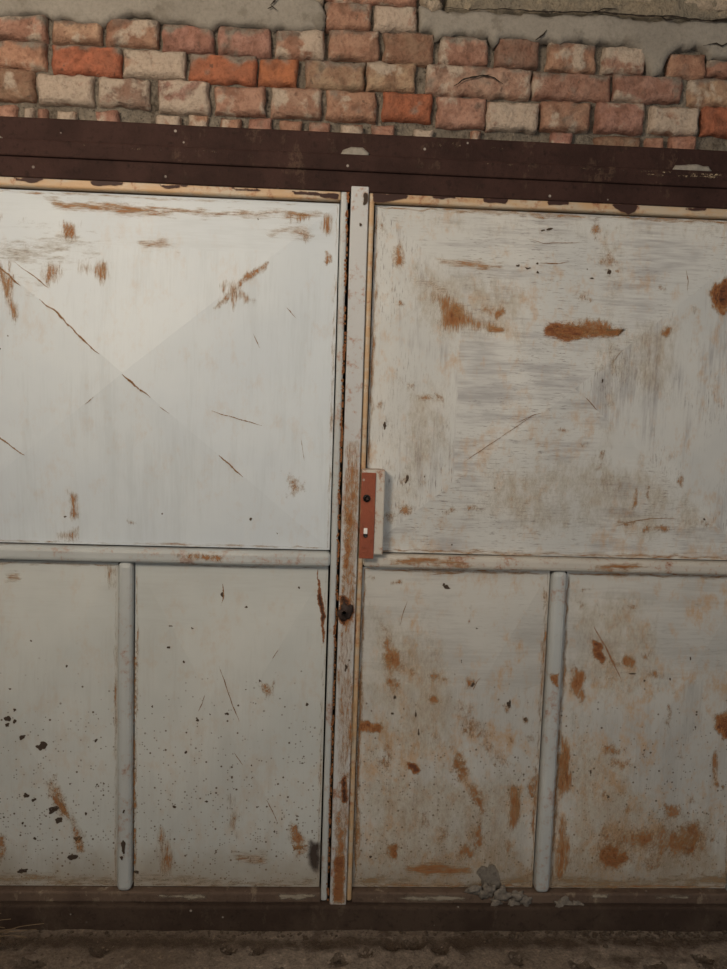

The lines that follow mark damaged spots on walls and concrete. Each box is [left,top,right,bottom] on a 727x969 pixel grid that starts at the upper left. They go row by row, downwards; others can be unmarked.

flaking render [419,0,727,24]